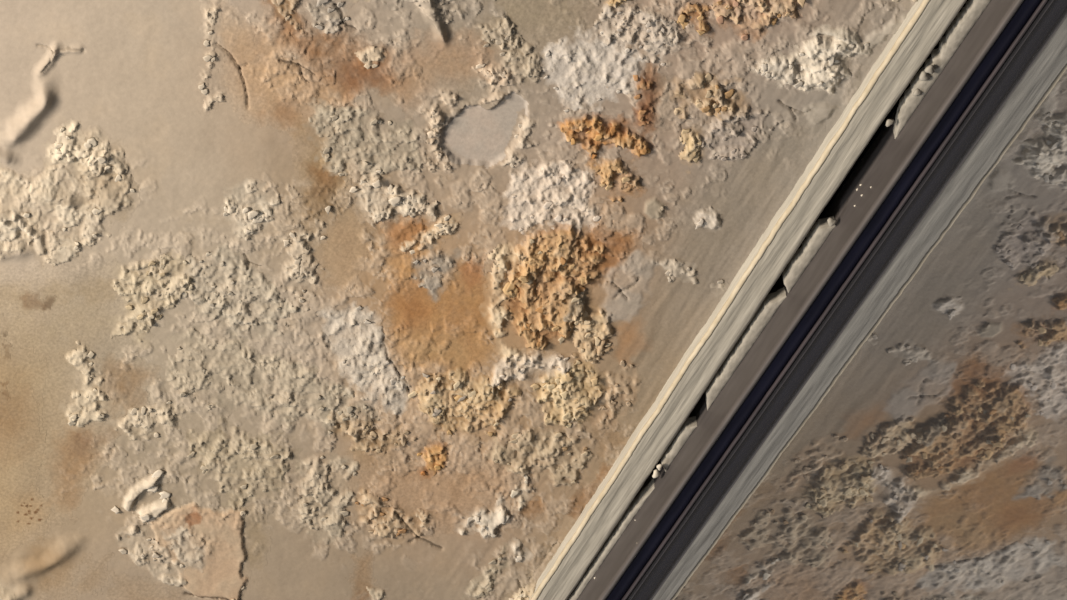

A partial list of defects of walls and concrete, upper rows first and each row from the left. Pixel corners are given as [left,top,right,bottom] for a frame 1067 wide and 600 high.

peeling [0,118,141,272]
peeling [194,0,232,117]
peeling [262,0,354,42]
rust [206,0,629,234]
flaking render [301,0,544,265]
rust [370,216,648,377]
rust [555,68,662,202]
peeling [588,1,773,174]
peeling [662,256,734,299]
peeling [691,203,723,234]
rust [677,0,809,44]
peeling [58,177,642,600]